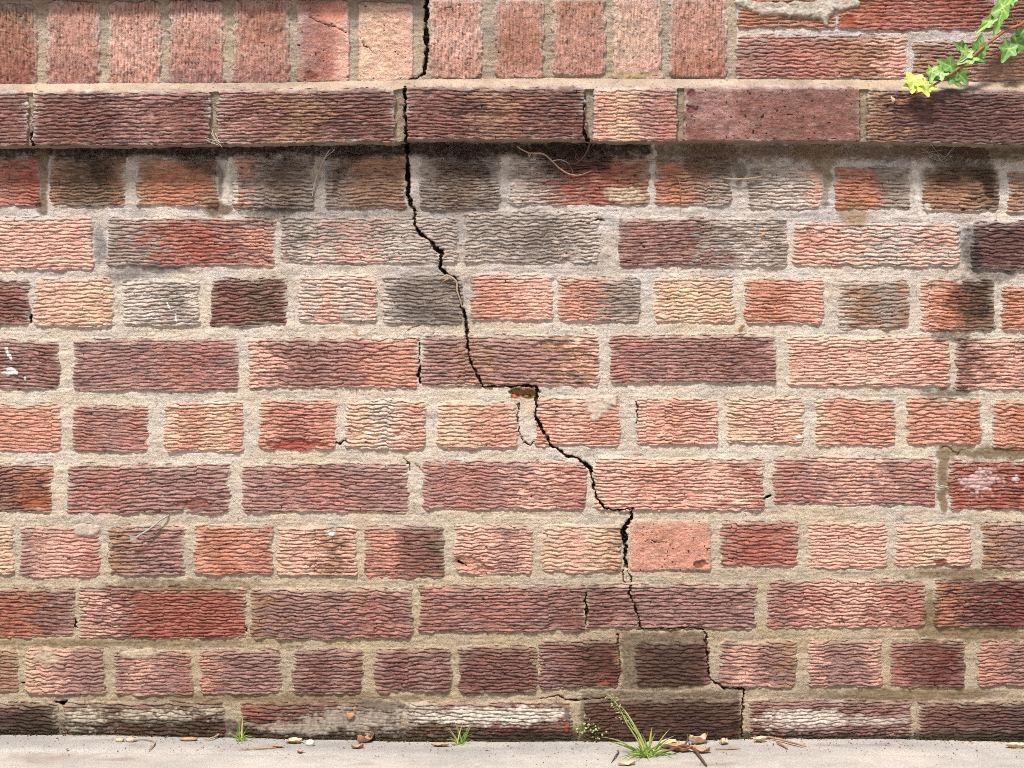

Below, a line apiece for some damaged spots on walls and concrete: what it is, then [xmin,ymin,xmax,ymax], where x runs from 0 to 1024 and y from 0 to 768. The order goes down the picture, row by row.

damp [0,698,575,740]
crack [402,0,745,737]